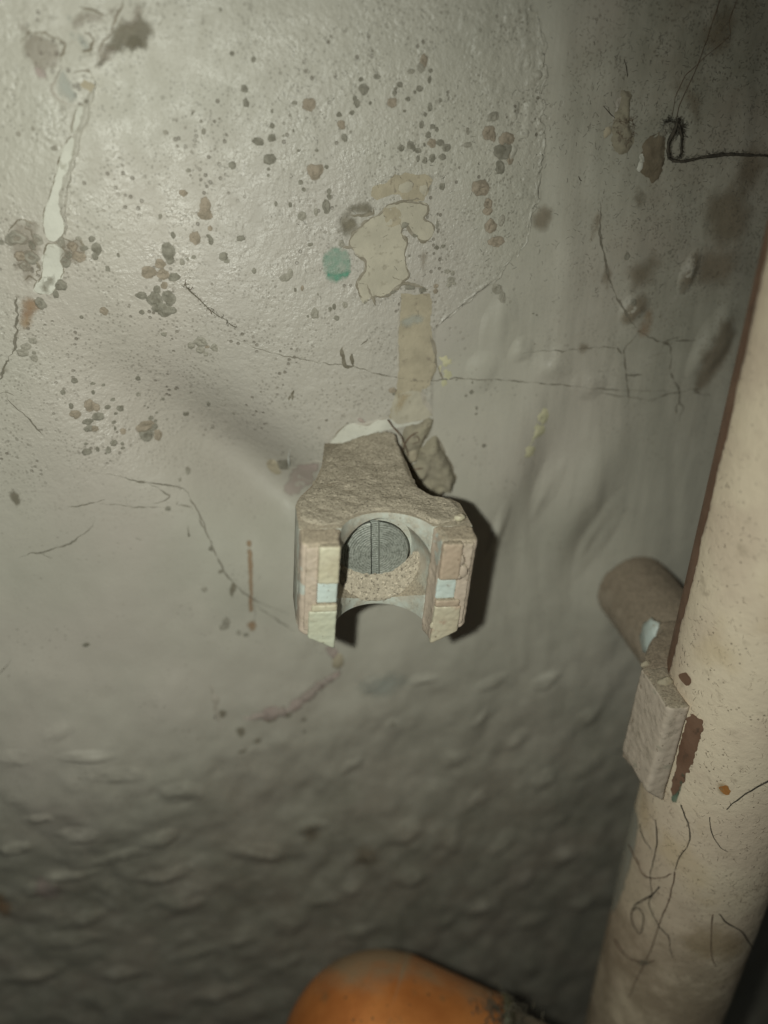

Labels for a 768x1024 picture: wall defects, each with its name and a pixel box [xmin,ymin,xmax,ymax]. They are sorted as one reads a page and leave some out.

crack [0,19,151,435]
peeling [329,172,452,443]
crack [225,200,711,421]
spalling [603,89,669,183]
crack [21,474,292,630]
corrosion [247,541,255,630]